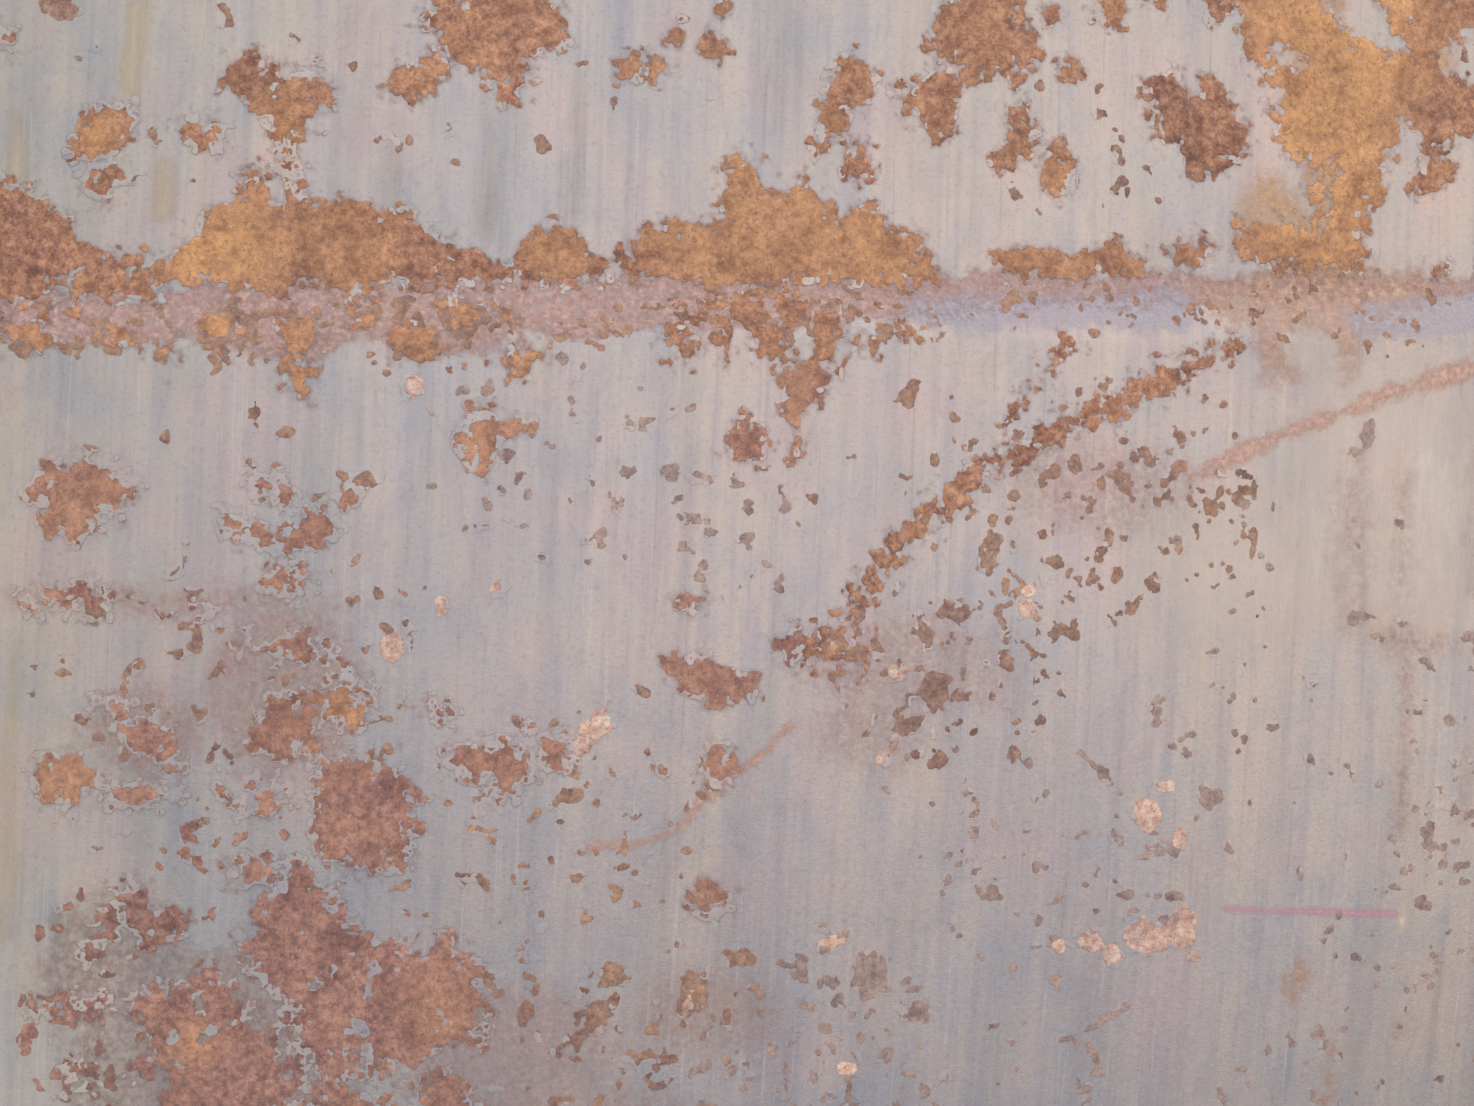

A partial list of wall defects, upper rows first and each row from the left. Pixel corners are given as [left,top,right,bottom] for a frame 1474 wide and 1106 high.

rust [0,0,1474,478]
peeling [197,293,517,433]
rust [18,443,150,551]
peeling [660,444,785,593]
spalling [778,280,1275,794]
rust [12,463,499,1106]
rust [426,691,582,807]
rust [659,650,765,710]
rust [772,619,826,667]
peeling [919,749,1226,991]
peeling [16,988,134,1106]
peeling [468,862,955,1106]